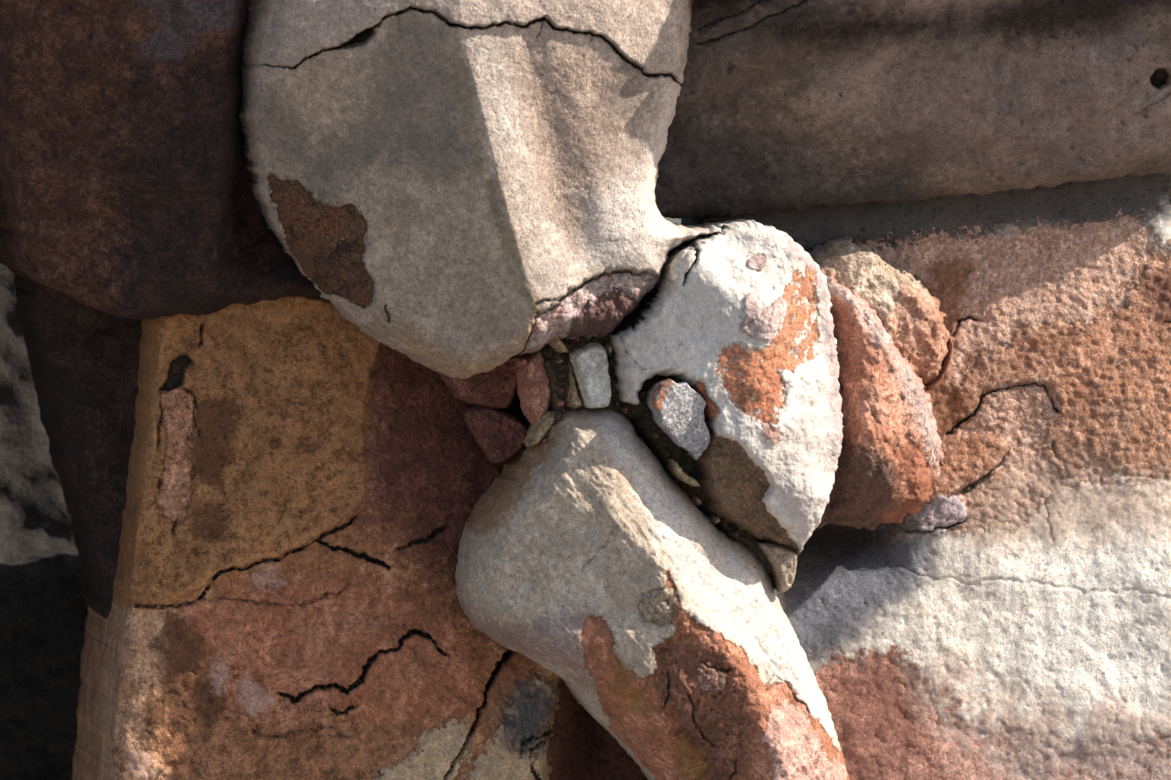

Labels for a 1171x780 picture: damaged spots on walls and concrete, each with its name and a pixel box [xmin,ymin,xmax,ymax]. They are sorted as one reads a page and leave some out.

crack [699,0,808,45]
crack [946,383,1059,435]
crack [136,516,445,609]
crack [254,629,447,739]
crack [444,650,512,777]